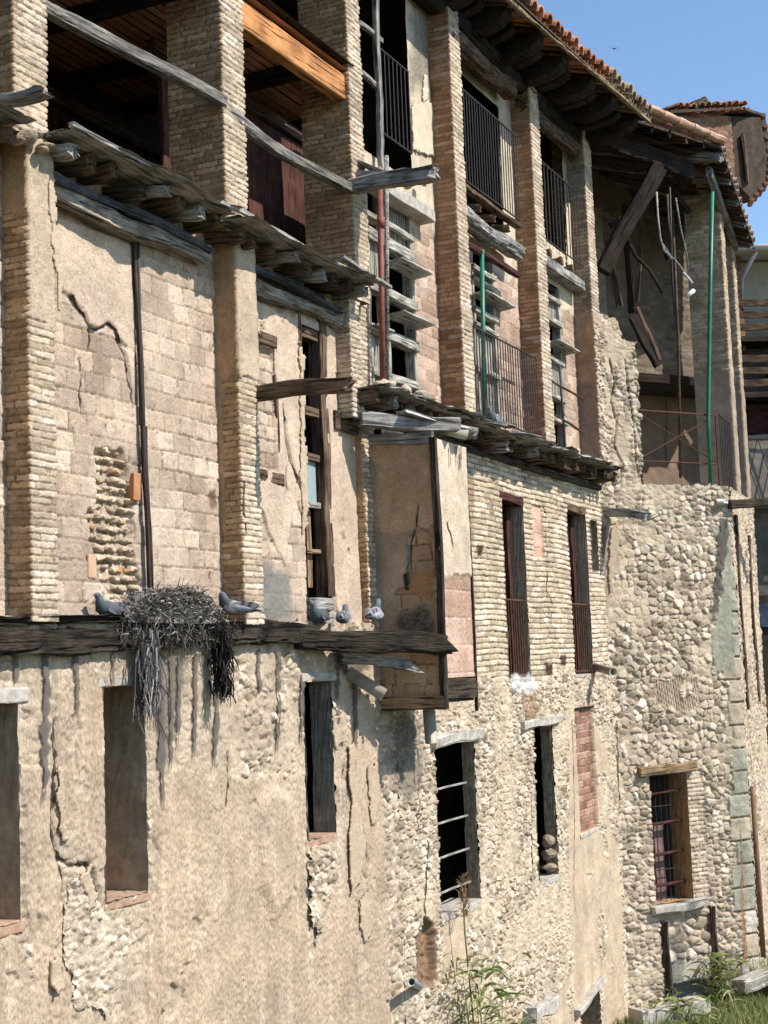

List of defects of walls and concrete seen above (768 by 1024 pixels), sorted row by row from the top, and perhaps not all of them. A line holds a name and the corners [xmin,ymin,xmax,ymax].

crack [69,294,134,412]
spalling [86,447,141,600]
water stain [41,654,52,801]
water stain [158,654,200,807]
water stain [511,675,538,694]
crack [50,719,97,897]